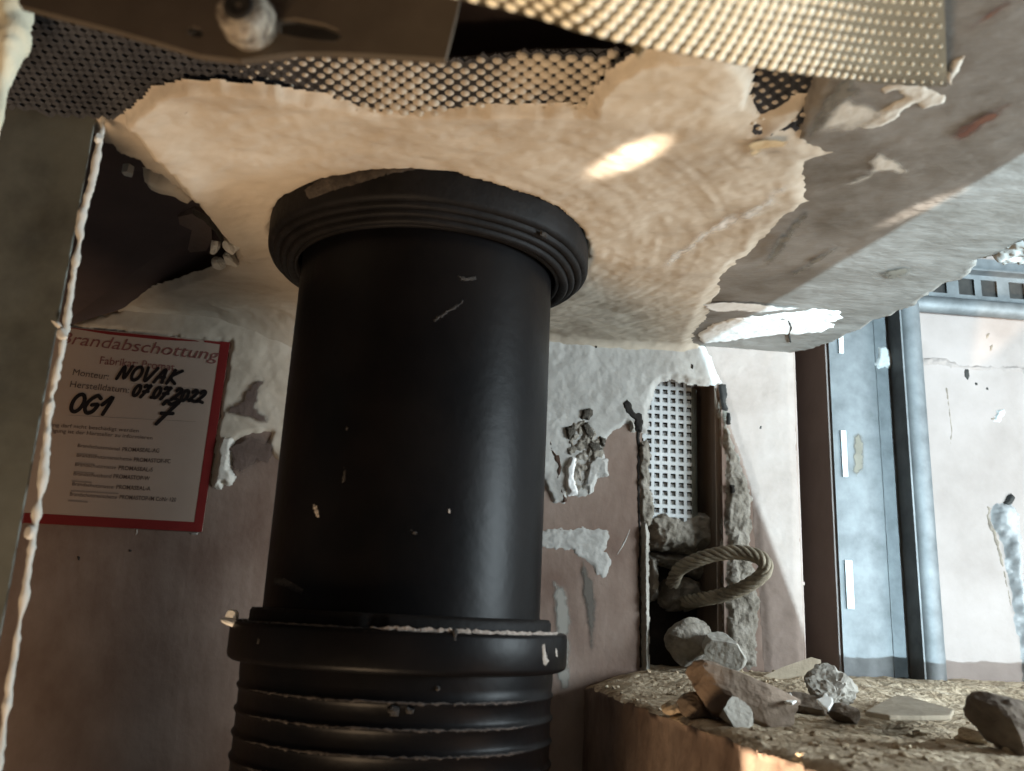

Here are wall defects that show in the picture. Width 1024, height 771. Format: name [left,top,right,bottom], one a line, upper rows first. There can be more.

peeling [228,381,267,423]
peeling [212,437,272,490]
spalling [565,408,609,496]
spalling [623,400,654,526]
spalling [717,384,753,546]
spalling [721,560,755,585]
spalling [721,590,760,670]